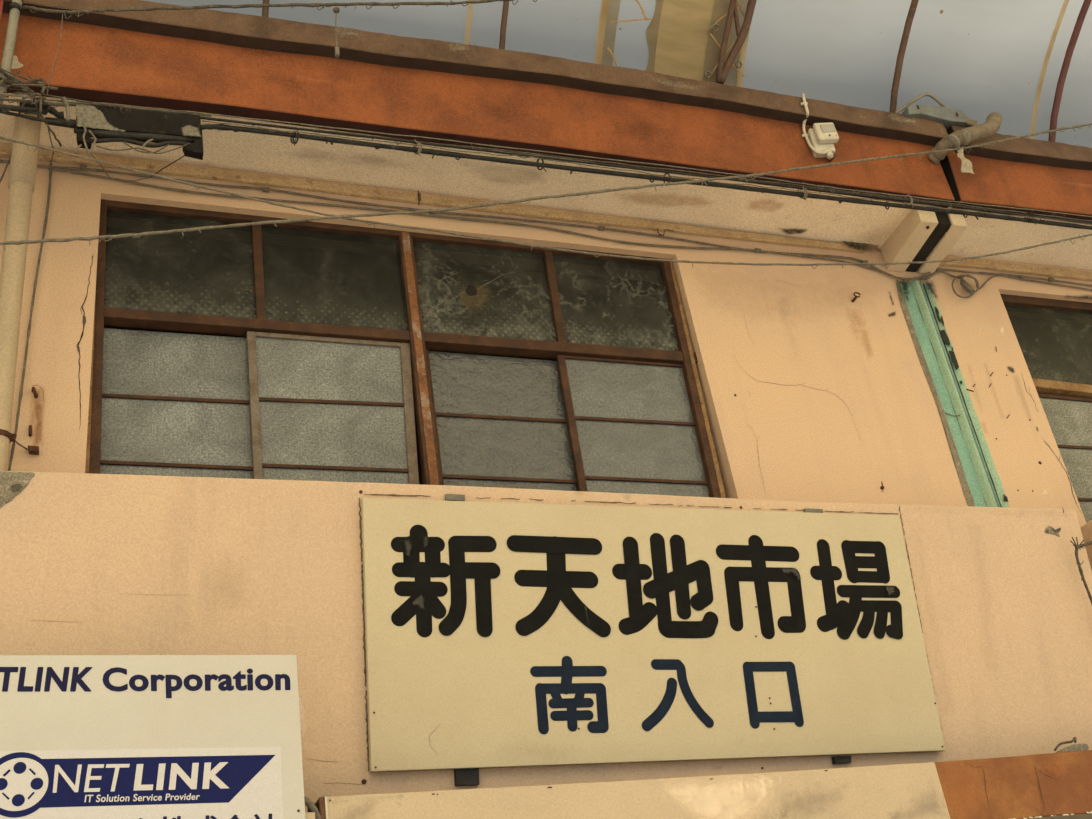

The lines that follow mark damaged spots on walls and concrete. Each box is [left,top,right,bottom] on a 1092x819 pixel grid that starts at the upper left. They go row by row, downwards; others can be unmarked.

crack [77,256,93,429]
flaking render [0,471,35,508]